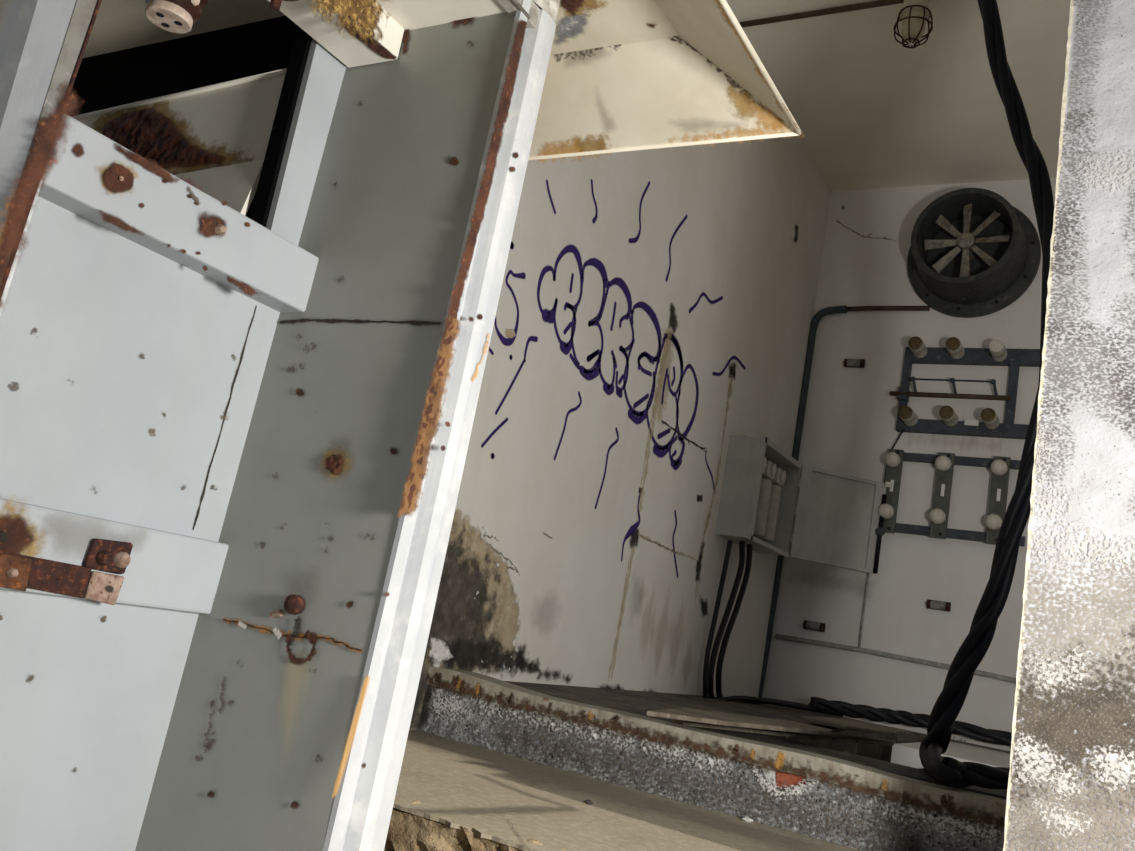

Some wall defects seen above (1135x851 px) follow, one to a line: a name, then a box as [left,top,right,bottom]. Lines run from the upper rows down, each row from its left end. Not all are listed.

leakage [516,647,571,682]